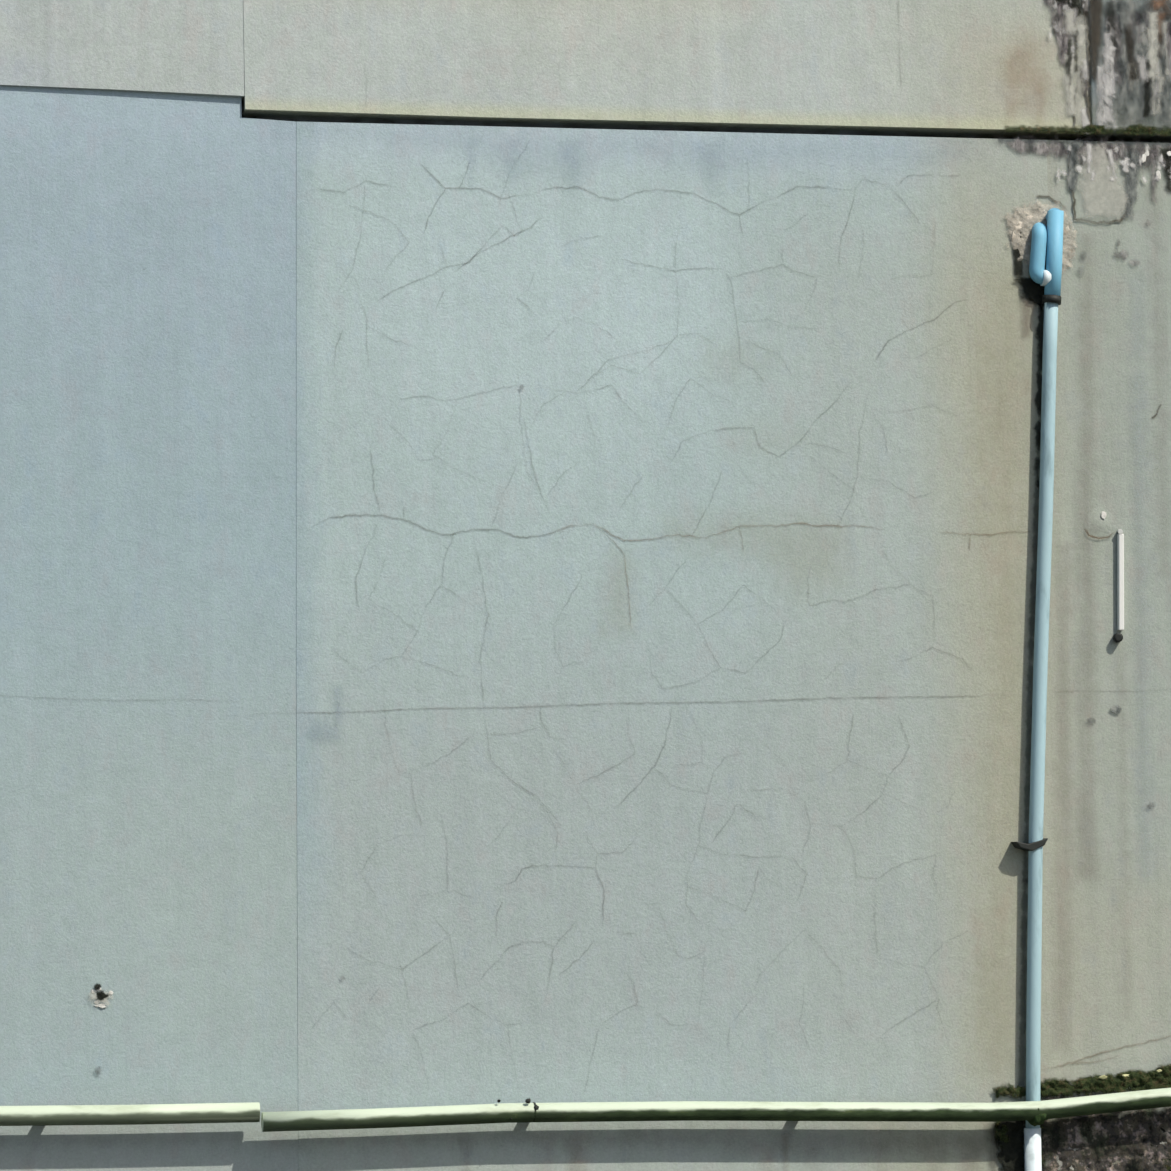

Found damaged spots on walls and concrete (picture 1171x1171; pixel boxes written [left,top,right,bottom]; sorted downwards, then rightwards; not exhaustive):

peeling [1049,2,1088,114]
peeling [1105,4,1171,116]
peeling [1057,144,1171,214]
spalling [1005,202,1077,271]
damp [1040,1107,1171,1171]